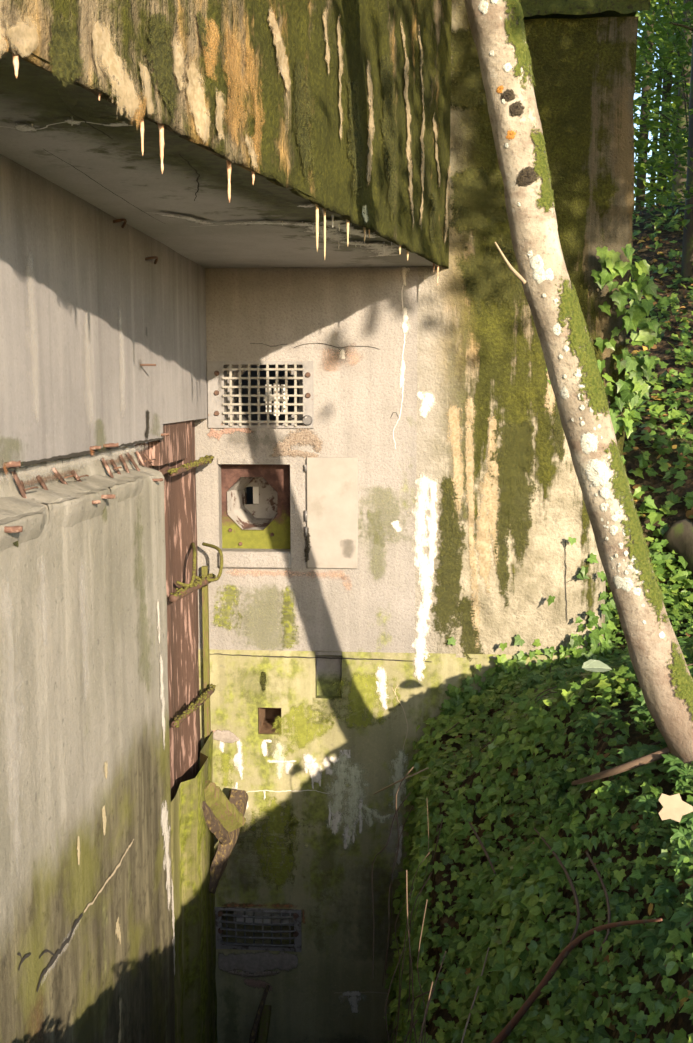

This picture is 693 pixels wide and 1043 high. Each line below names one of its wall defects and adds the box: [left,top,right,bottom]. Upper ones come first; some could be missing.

crack [0,109,315,227]
water stain [304,10,451,257]
spalling [270,428,324,458]
crack [250,266,410,449]
water stain [544,370,565,462]
water stain [391,396,539,683]
water stain [157,599,166,750]
water stain [281,587,298,648]
water stain [216,740,244,794]
water stain [261,739,408,849]
crack [17,839,134,992]
water stain [161,801,175,976]